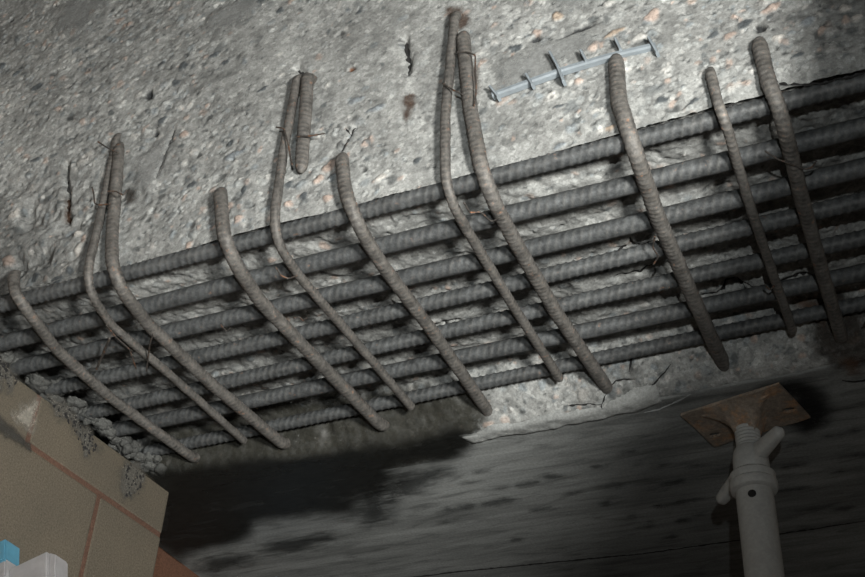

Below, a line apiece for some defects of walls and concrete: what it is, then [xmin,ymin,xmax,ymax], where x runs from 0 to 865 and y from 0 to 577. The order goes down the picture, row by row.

rust [447,8,468,28]
rust [404,94,415,118]
spalling [0,0,865,300]
spalling [426,287,542,326]
spalling [564,287,686,325]
spalling [306,315,423,353]
spalling [446,316,558,350]
spalling [37,343,171,381]
spalling [332,342,439,374]
spalling [464,317,835,432]
spalling [53,367,199,456]
spalling [104,392,221,424]